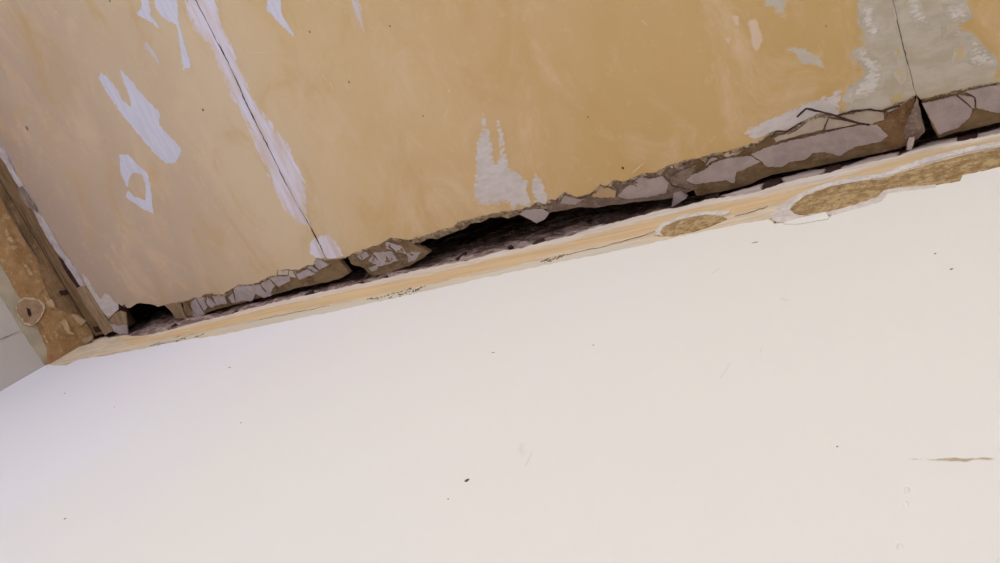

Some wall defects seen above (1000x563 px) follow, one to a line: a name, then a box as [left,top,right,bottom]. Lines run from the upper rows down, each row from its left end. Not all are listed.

crack [195,0,327,259]
peeling [0,0,1000,366]
crack [893,0,917,98]